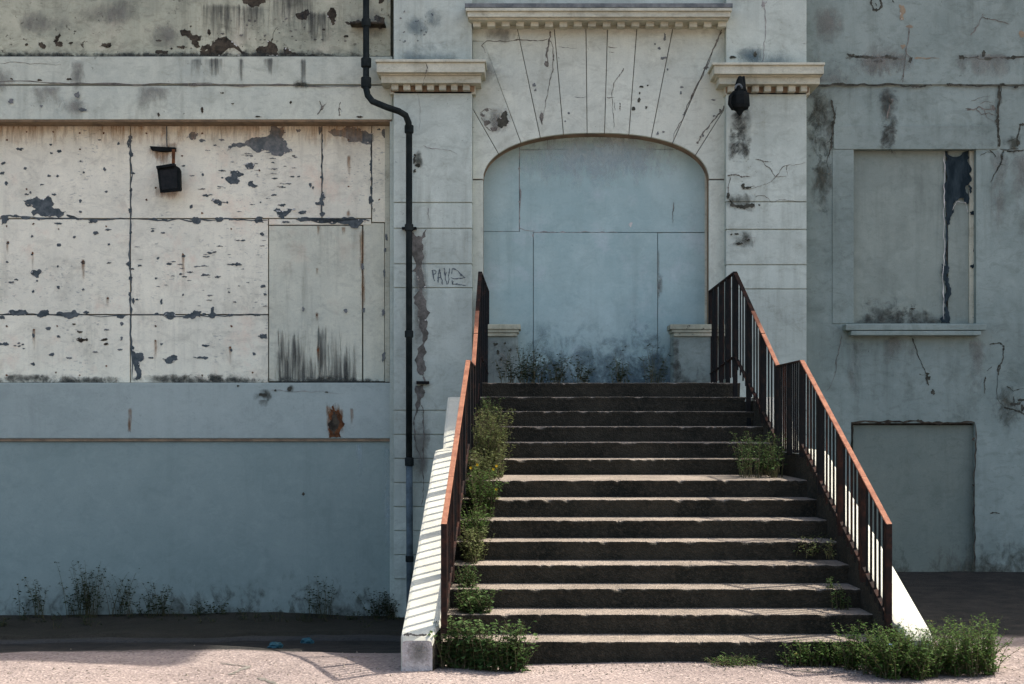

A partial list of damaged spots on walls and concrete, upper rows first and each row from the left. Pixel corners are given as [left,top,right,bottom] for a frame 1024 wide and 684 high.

spalling [155,0,385,57]
leakage [730,113,749,156]
crack [727,14,1024,202]
leakage [882,90,894,143]
peeling [0,116,385,380]
peeling [940,224,951,323]
leakage [278,338,369,383]
spalling [412,229,430,502]
crack [912,338,935,395]
crack [984,342,1024,415]
rust [328,406,345,438]